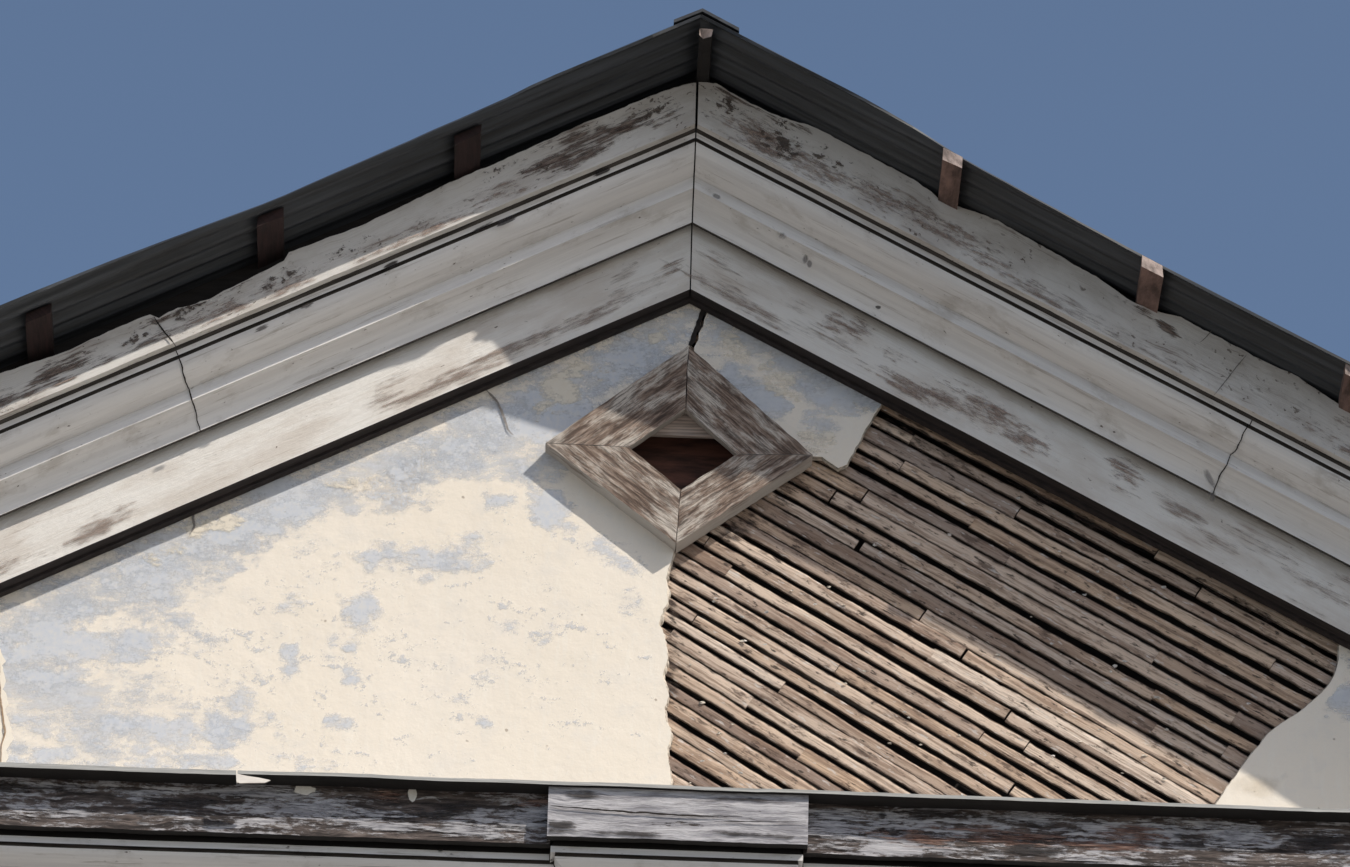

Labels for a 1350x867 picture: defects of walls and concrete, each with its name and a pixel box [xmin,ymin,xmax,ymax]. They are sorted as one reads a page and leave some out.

peeling [329,97,683,269]
peeling [706,87,1033,286]
peeling [261,266,305,292]
crack [154,317,201,432]
crack [1213,420,1252,492]
flaking render [0,301,1350,866]
crack [0,649,14,762]